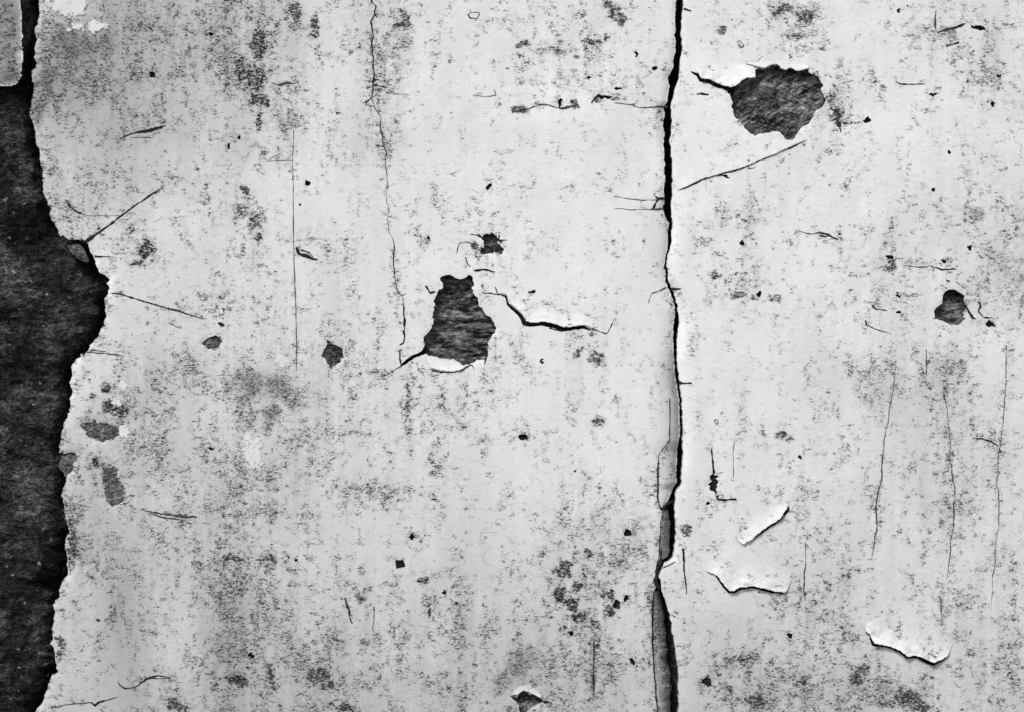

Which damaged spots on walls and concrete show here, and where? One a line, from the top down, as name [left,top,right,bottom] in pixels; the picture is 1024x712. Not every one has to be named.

spalling [691,58,849,140]
spalling [424,233,505,374]
spalling [934,280,995,327]
crack [474,0,806,712]
spalling [80,419,120,442]
spalling [59,452,77,476]
peeling [700,503,792,594]
peeling [866,613,953,665]
spalling [512,685,553,712]